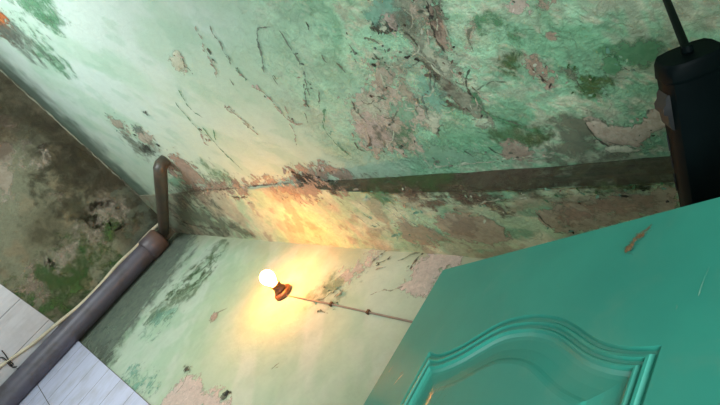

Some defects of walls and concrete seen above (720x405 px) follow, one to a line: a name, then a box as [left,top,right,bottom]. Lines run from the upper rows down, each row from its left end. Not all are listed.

peeling [337,0,494,160]
peeling [499,49,558,90]
peeling [107,115,160,156]
spalling [583,109,665,154]
spalling [265,159,359,205]
spalling [391,210,512,298]
spalling [160,366,232,405]